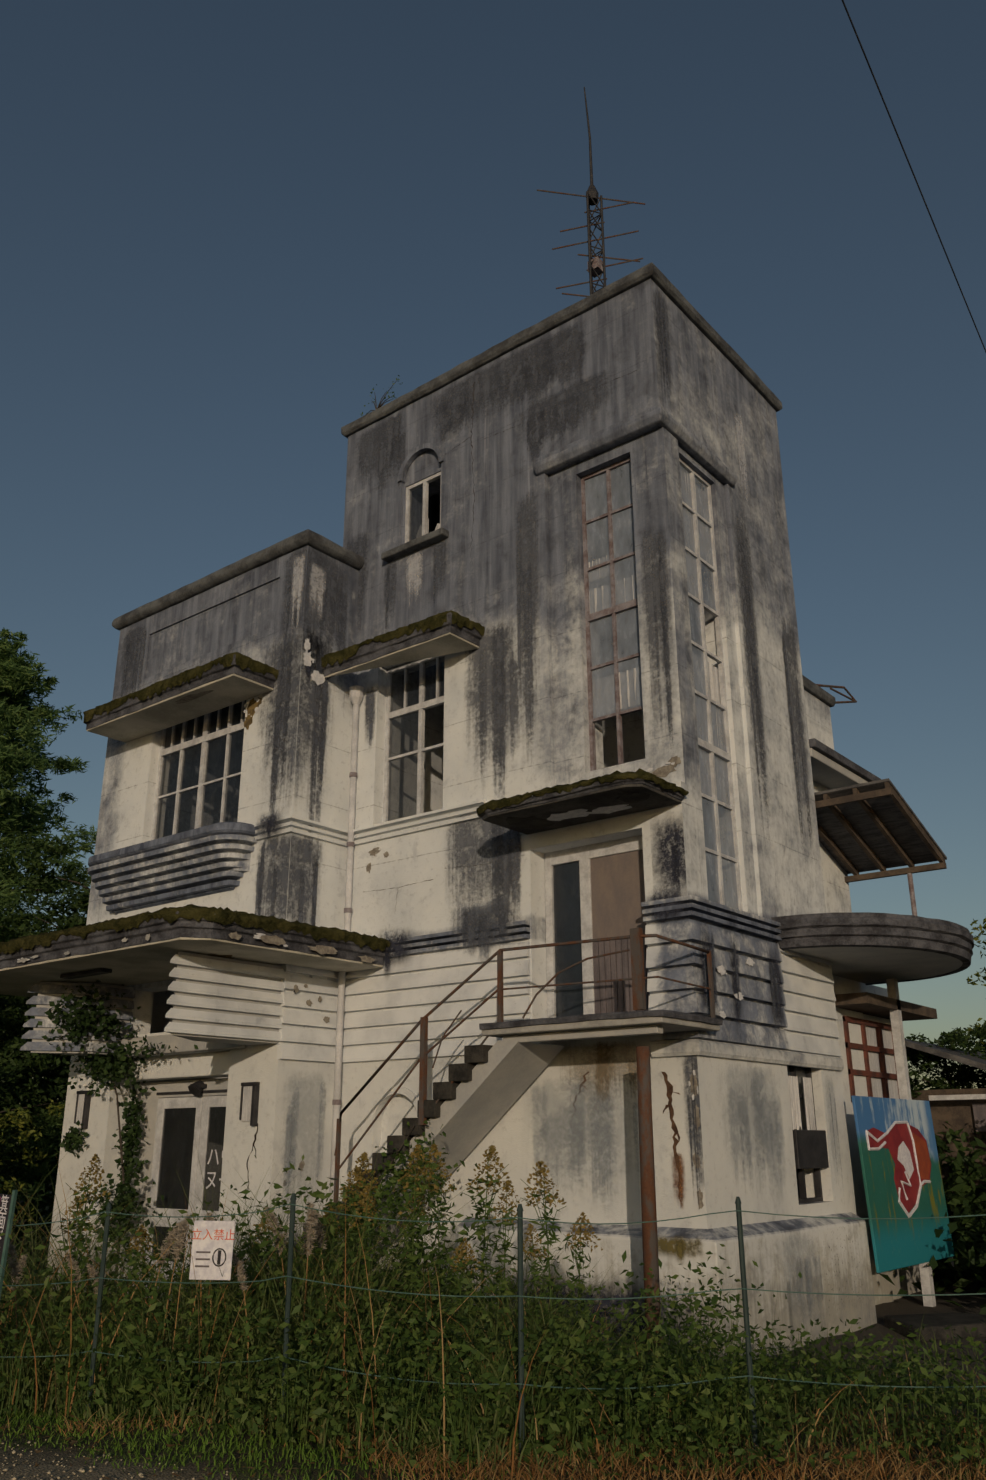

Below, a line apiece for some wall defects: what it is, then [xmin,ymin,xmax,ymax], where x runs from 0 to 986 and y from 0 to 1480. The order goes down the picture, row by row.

damp [436,326,608,456]
damp [654,292,671,383]
spalling [303,638,325,686]
damp [384,542,446,627]
damp [467,492,538,785]
damp [642,534,672,719]
damp [255,535,367,926]
damp [448,813,554,956]
crack [245,1123,258,1195]
rust [673,1155,684,1199]